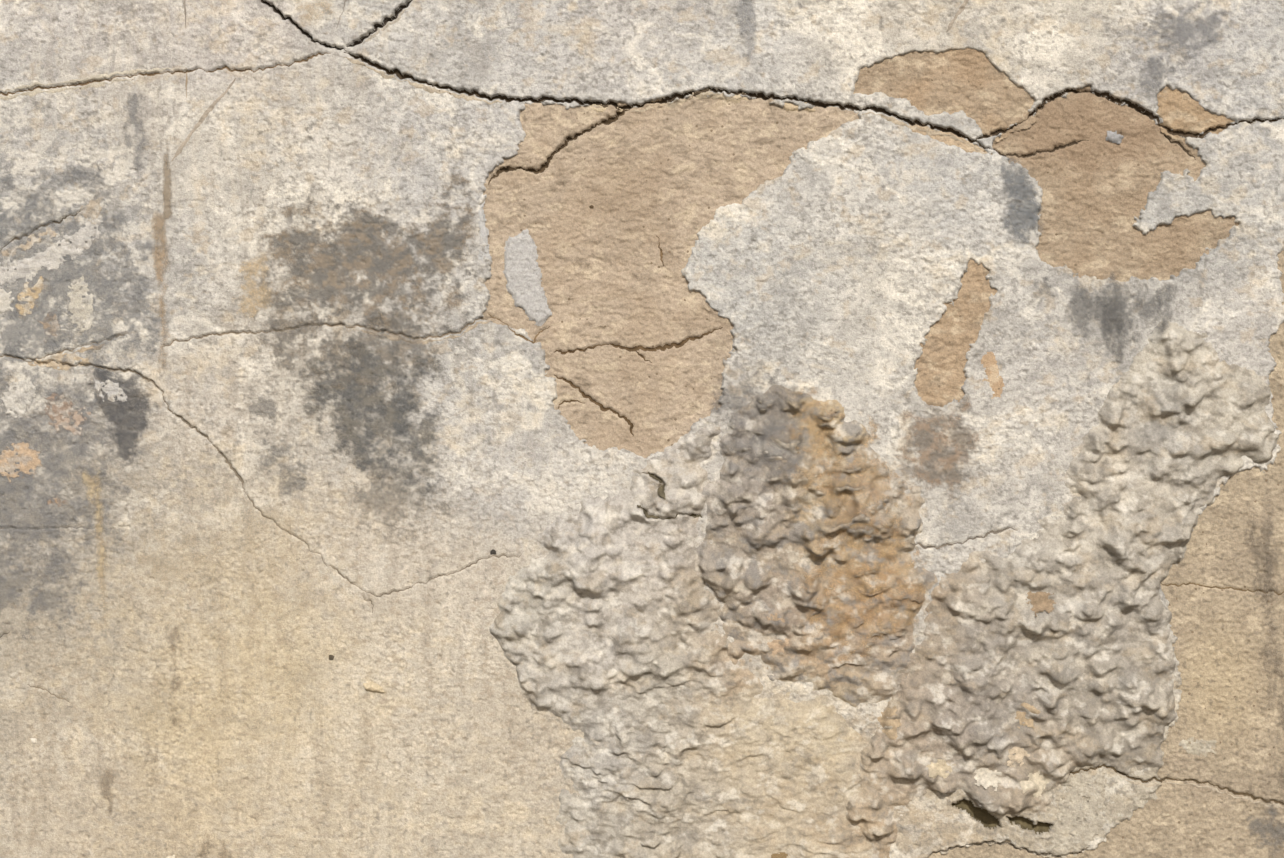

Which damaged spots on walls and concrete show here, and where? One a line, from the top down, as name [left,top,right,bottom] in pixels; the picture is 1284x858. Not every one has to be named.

water stain [0,170,159,613]
crack [0,333,521,613]
water stain [261,175,475,492]
crack [161,314,723,436]
crack [0,0,1284,185]
flaking render [478,88,859,458]
crack [637,472,702,519]
flaking render [914,258,1005,407]
crack [910,527,1015,550]
flaking render [853,48,1239,282]
flaking render [928,322,1284,858]
crack [1160,582,1284,596]